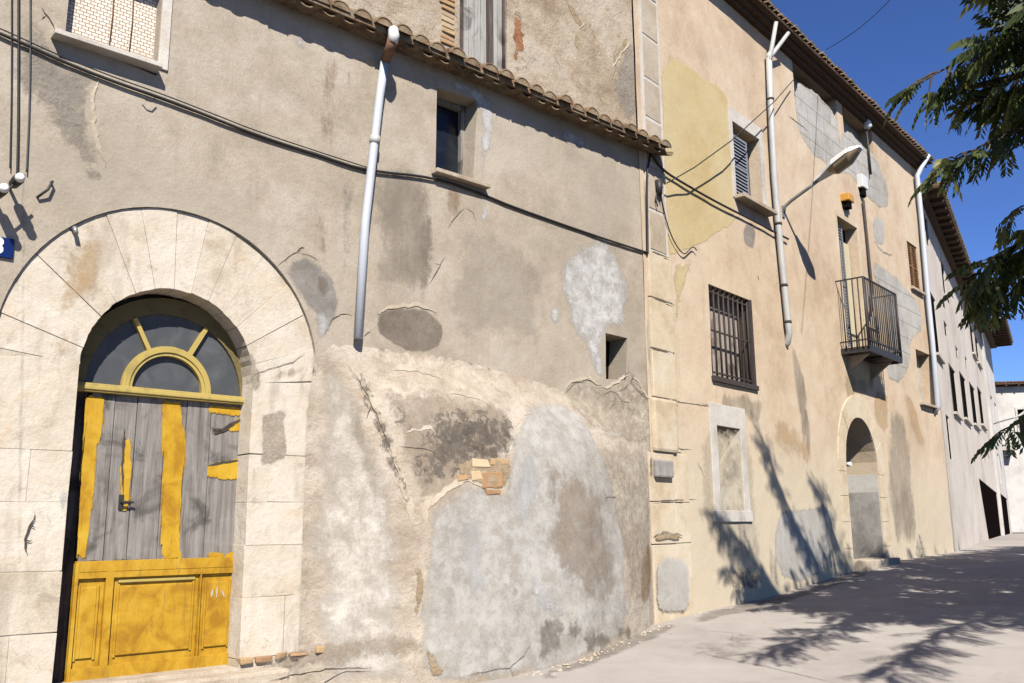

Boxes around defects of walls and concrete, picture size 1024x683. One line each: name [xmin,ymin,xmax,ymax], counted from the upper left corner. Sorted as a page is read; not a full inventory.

flaking render [513,17,524,70]
peeling [795,83,921,382]
crack [24,515,35,555]
peeling [76,394,104,559]
peeling [120,433,132,511]
peeling [153,400,186,559]
peeling [207,458,238,480]
peeling [234,363,510,679]
crack [350,368,435,453]
water stain [361,374,516,488]
crack [565,372,649,409]
flaking render [564,374,695,597]